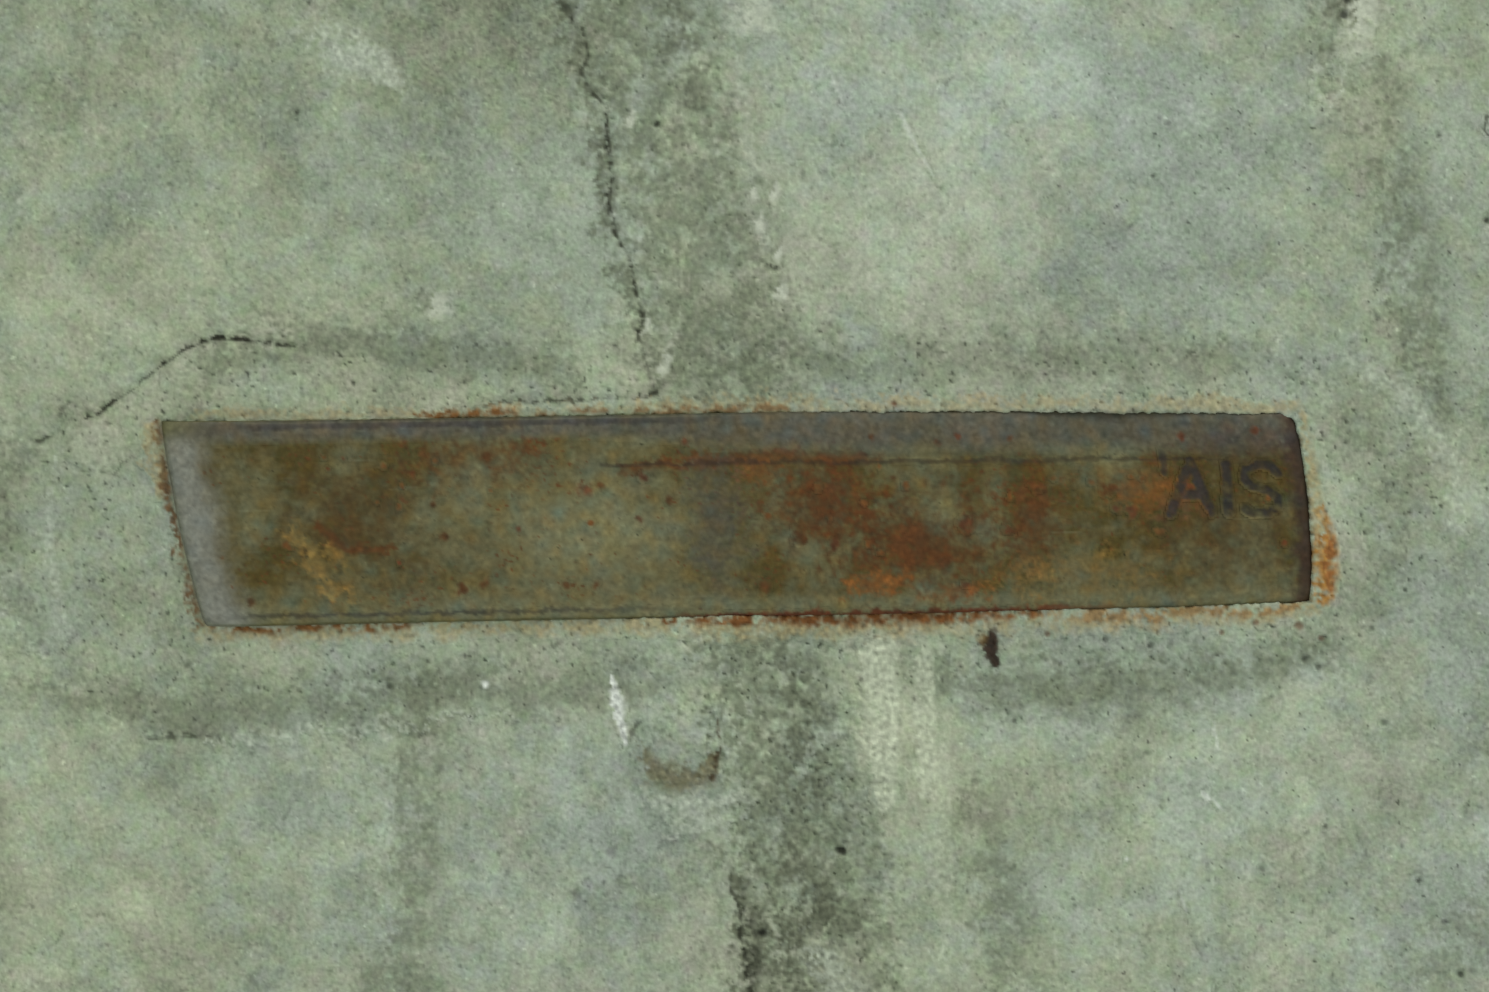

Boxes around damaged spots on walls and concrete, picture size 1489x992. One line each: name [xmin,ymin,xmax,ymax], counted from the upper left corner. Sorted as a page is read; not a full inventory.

crack [493,0,661,406]
crack [30,332,379,446]
corrosion [134,384,1345,690]
crack [728,883,767,992]